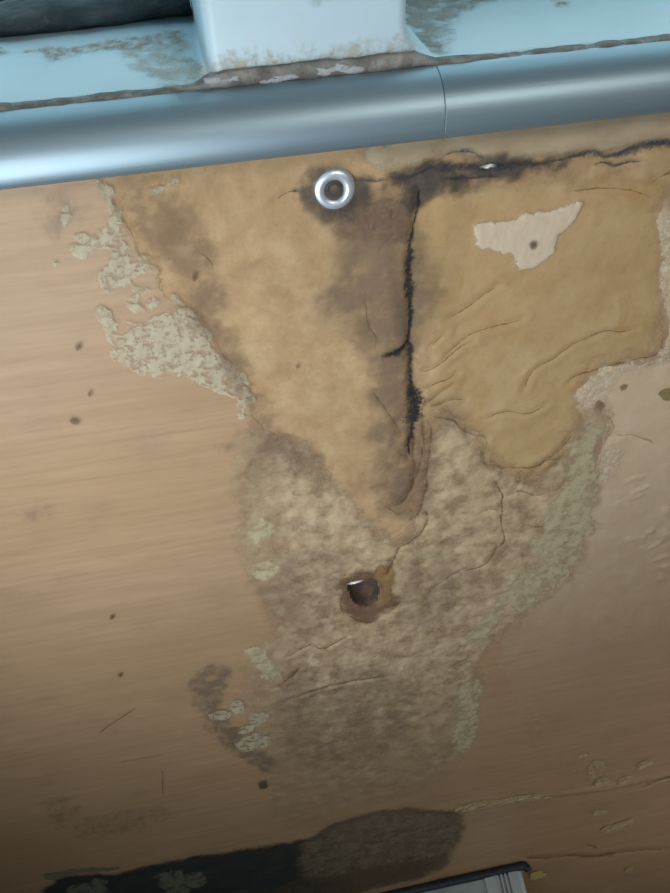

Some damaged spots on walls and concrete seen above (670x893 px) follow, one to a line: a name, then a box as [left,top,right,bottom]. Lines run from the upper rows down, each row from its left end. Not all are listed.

peeling [473,202,583,270]
peeling [70,178,256,419]
leakage [301,155,565,509]
crack [354,139,670,573]
peeling [574,341,670,434]
leakage [209,700,271,752]
leakage [44,811,460,893]